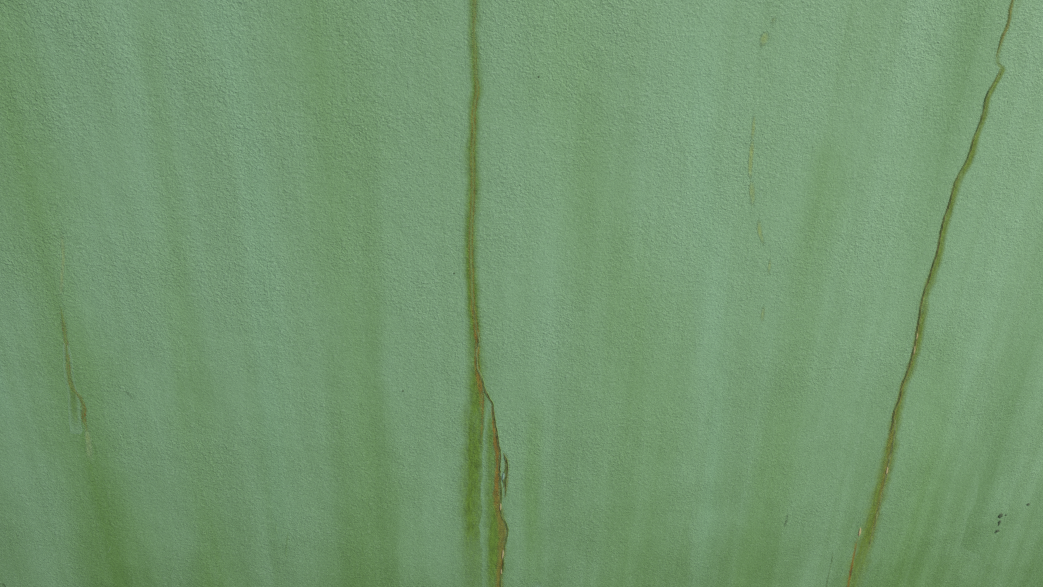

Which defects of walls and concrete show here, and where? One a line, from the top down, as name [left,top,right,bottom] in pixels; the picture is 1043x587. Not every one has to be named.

crack [59,233,94,460]
damp [0,0,447,587]
crack [451,0,522,587]
damp [490,0,861,587]
crack [826,0,1025,587]
damp [880,0,1010,293]
damp [865,227,1043,587]